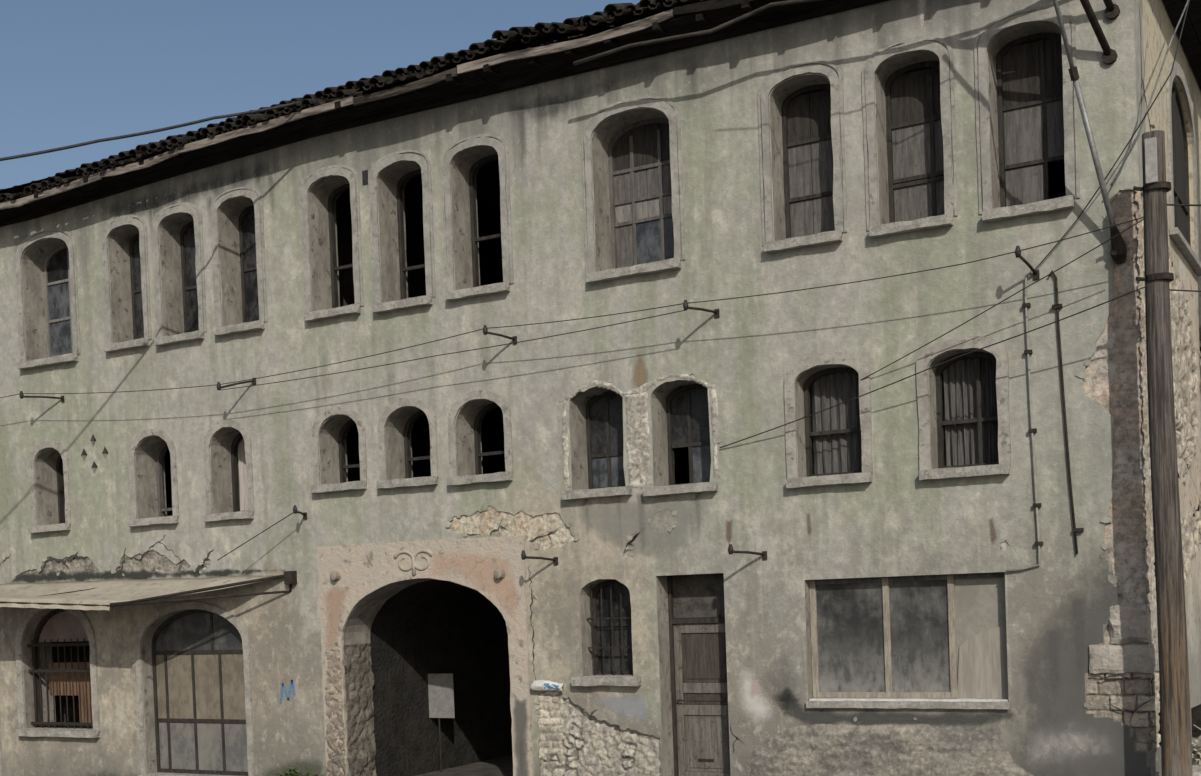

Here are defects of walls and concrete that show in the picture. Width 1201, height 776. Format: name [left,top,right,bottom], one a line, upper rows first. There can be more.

flaking render [1169,259,1201,485]
flaking render [559,371,721,489]
spalling [1076,185,1161,757]
flaking render [17,550,210,576]
crack [41,535,214,574]
flaking render [444,503,579,551]
flaking render [1180,501,1201,585]
leakage [1030,572,1151,776]
flaking render [534,691,661,776]